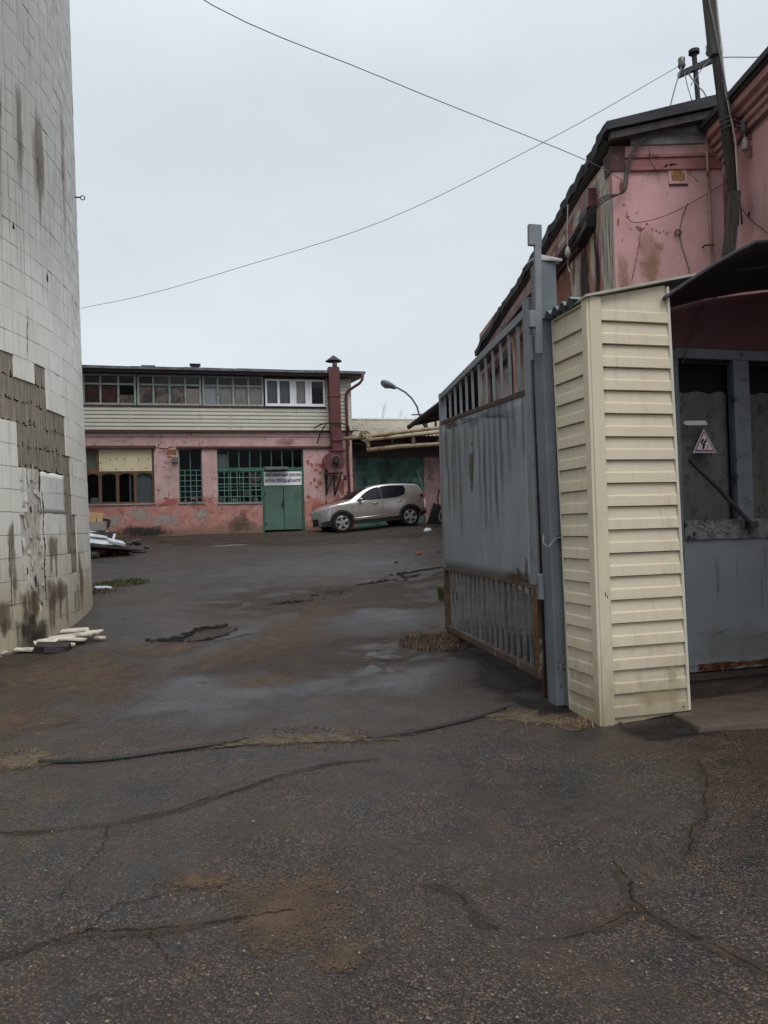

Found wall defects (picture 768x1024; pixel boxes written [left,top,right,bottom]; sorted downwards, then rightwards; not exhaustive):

spalling [0,350,77,625]
flaking render [106,497,212,526]
peeling [306,460,348,523]
water stain [0,527,84,647]
corrosion [698,658,768,672]
crack [1,758,380,899]
crack [685,760,730,855]
crack [0,895,293,960]
crack [425,861,768,973]